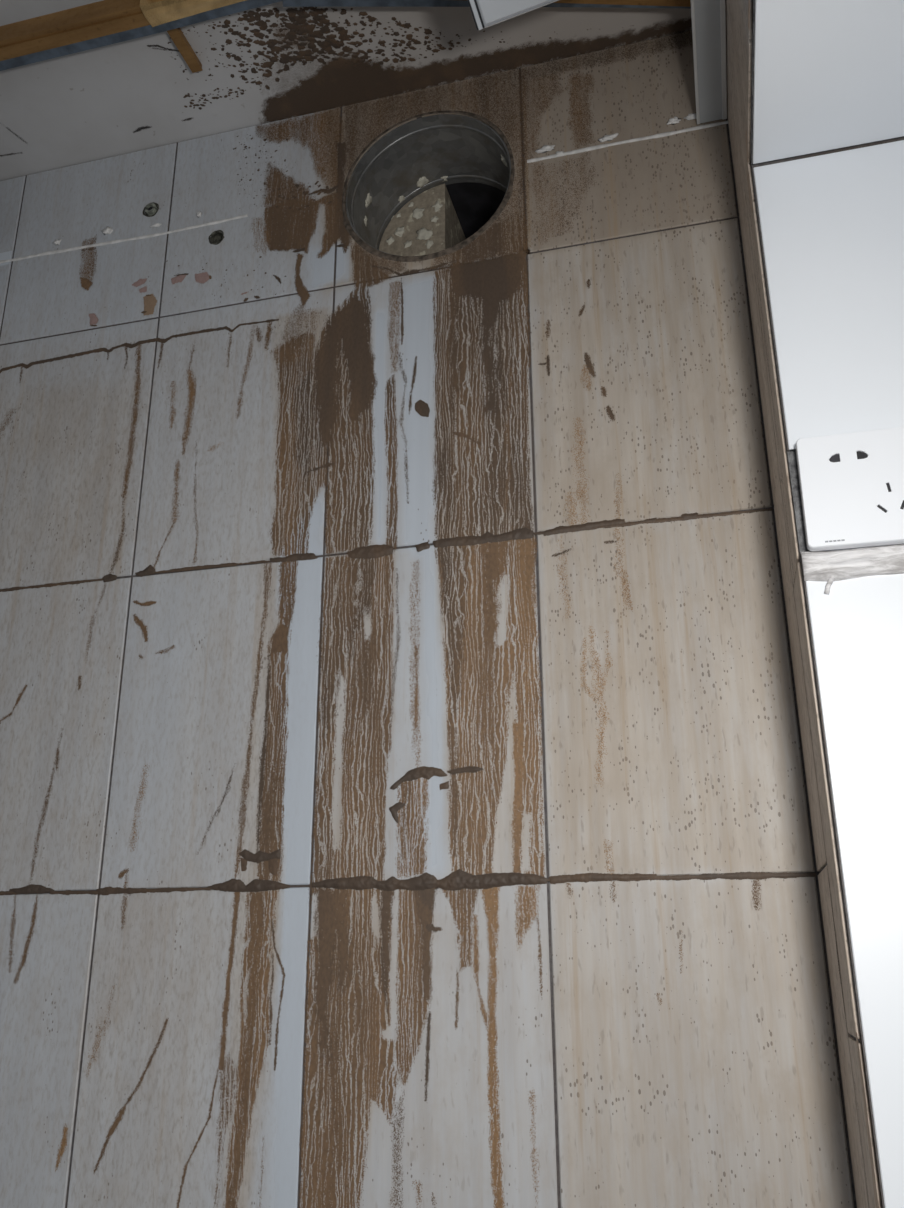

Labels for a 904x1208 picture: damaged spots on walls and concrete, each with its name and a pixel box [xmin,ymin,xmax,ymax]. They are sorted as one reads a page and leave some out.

water stain [109,344,142,573]
water stain [226,18,693,767]
water stain [435,538,538,858]
water stain [214,561,298,1208]
water stain [308,884,355,1069]
water stain [378,879,395,1012]
water stain [411,888,438,1101]
water stain [454,722,543,1208]
water stain [308,1106,339,1208]
water stain [388,1090,437,1208]